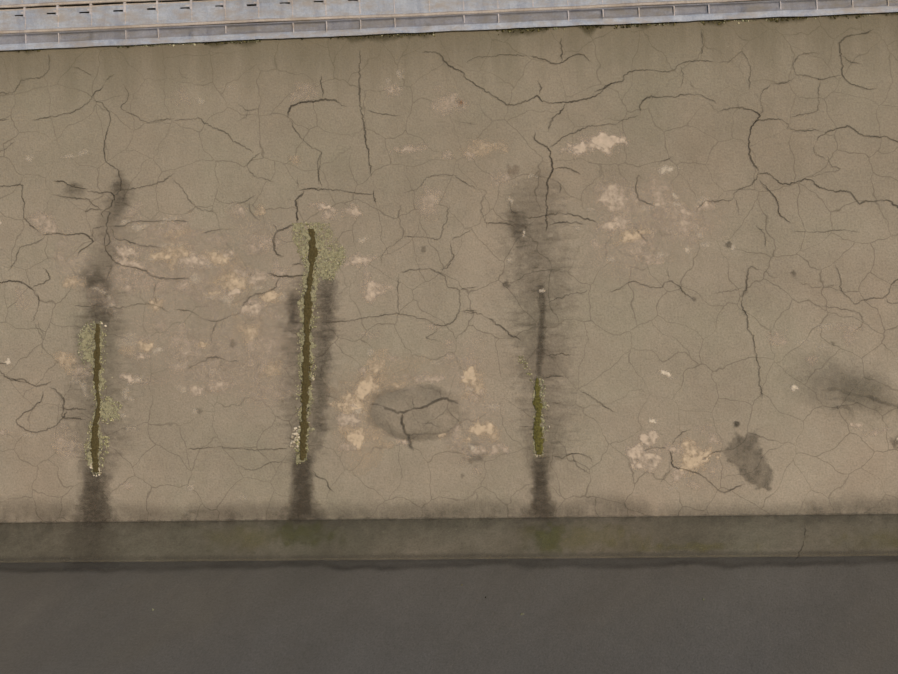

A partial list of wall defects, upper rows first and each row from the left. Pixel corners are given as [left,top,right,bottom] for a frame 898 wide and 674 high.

crack [288,90,328,113]
crack [532,70,641,115]
crack [534,137,560,199]
crack [746,109,864,205]
crack [46,233,180,280]
peeling [626,419,720,481]